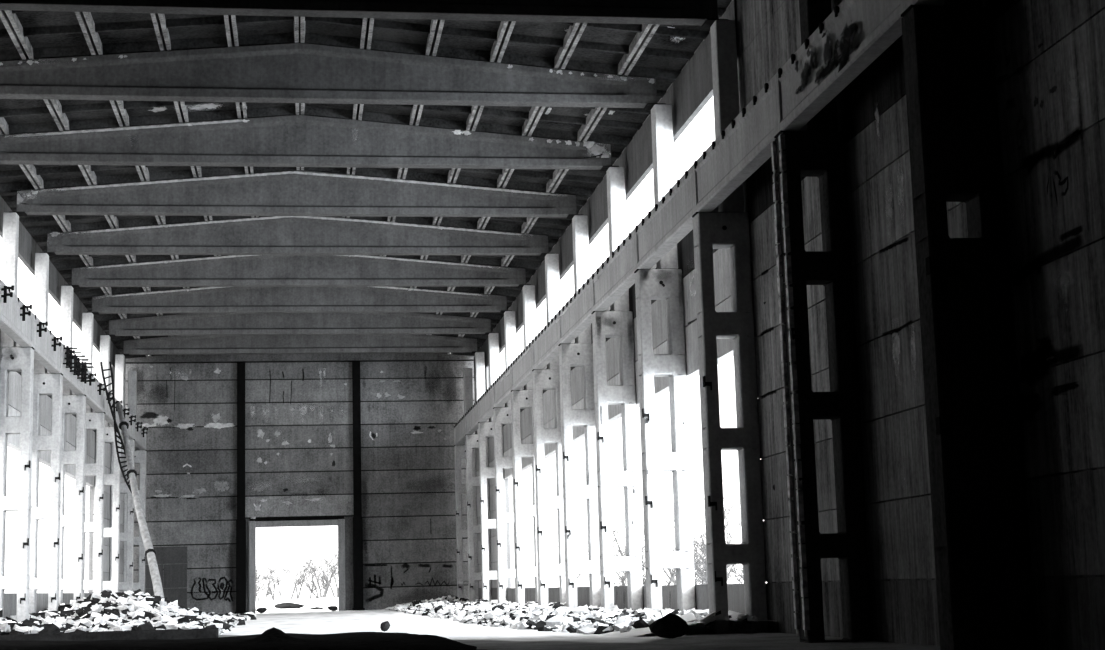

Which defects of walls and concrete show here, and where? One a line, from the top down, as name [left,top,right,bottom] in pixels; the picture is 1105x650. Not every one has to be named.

spalling [140,412,235,431]
peeling [257,429,289,465]